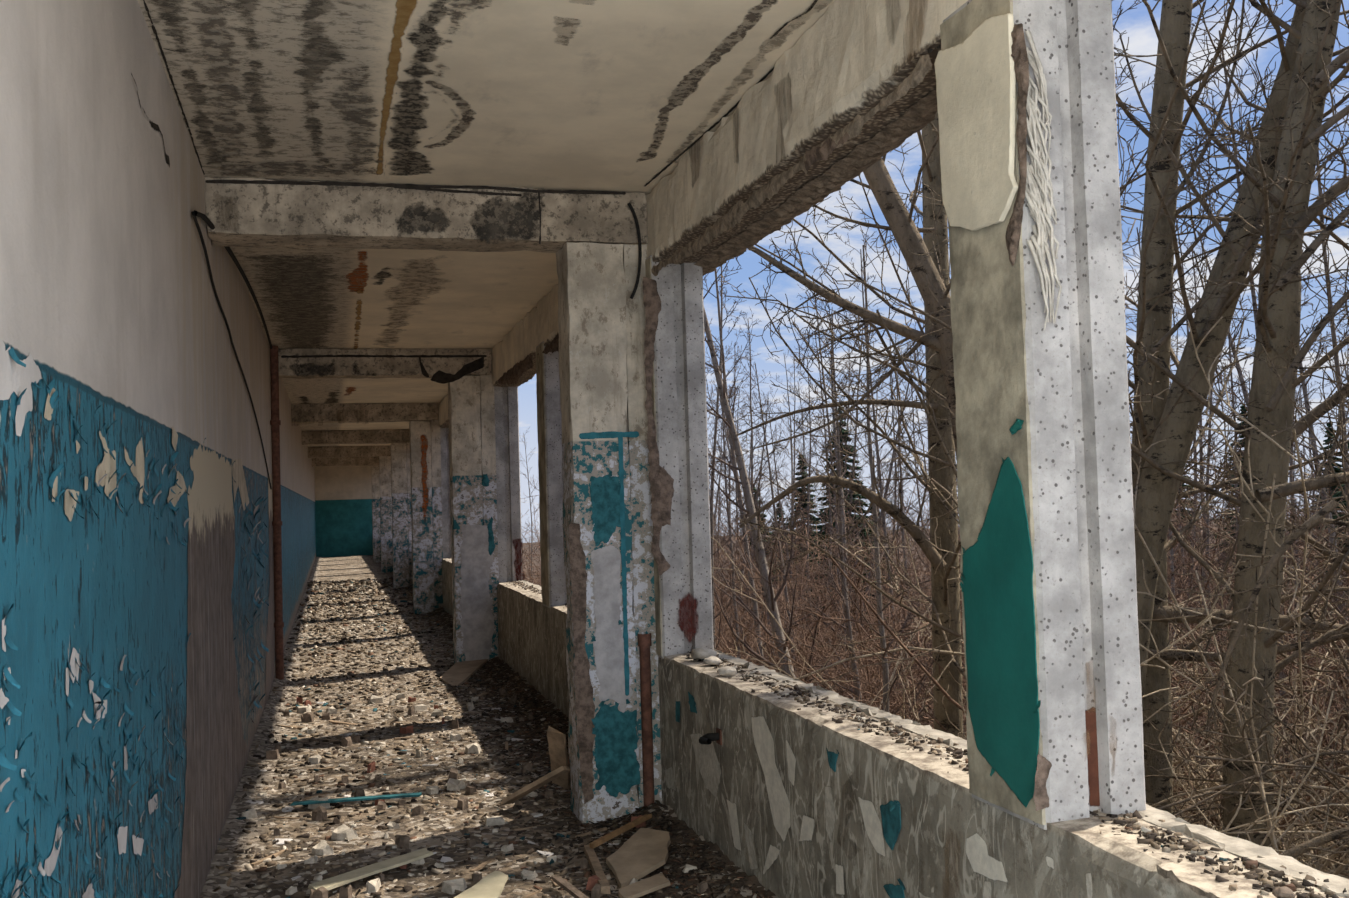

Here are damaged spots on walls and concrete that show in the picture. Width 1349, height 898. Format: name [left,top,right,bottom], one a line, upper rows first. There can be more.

water stain [246,255,345,404]
water stain [148,0,490,178]
rust [346,251,368,349]
water stain [374,261,440,347]
water stain [395,202,449,236]
water stain [471,192,545,244]
spalling [642,54,938,576]
spalling [1005,23,1062,330]
peeling [0,338,275,898]
peeling [569,471,641,804]
rust [678,593,699,651]
peeling [960,457,1052,811]